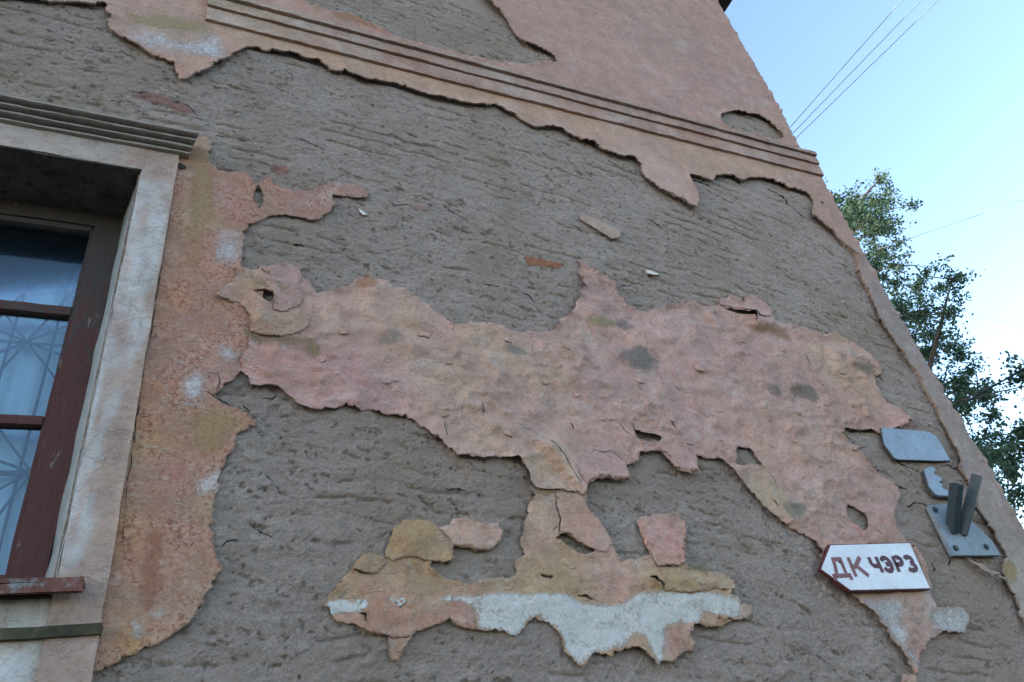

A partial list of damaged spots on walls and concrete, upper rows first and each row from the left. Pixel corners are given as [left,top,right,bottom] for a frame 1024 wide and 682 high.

spalling [0,0,912,370]
spalling [54,174,140,577]
spalling [92,260,970,682]
crack [522,423,583,534]
spalling [843,366,1024,682]